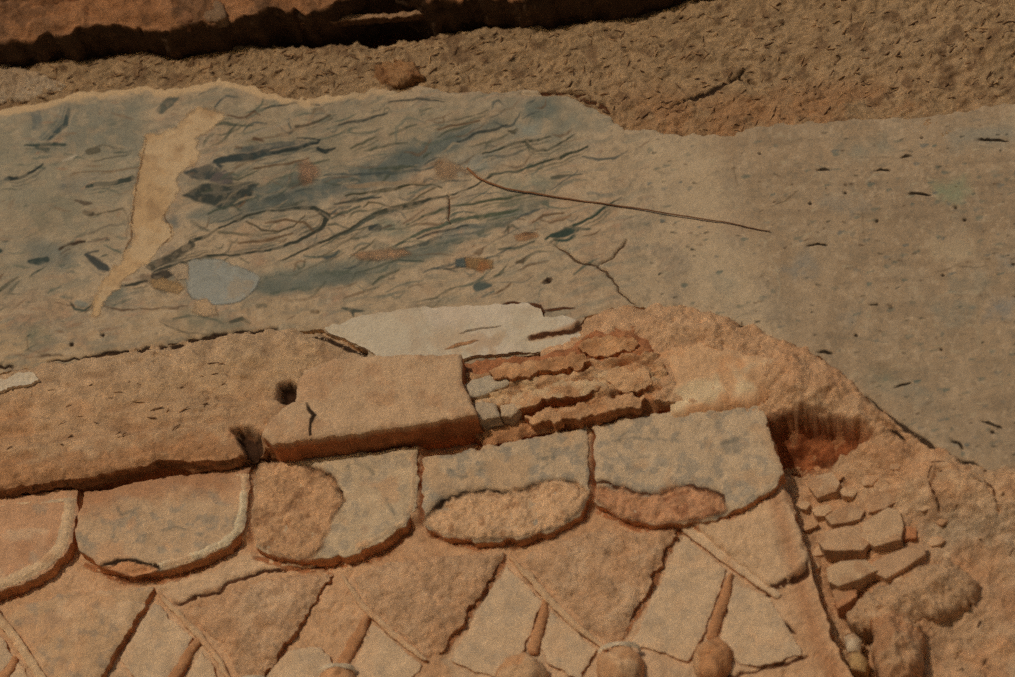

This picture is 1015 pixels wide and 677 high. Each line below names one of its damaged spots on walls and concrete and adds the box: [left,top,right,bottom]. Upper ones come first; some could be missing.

crack [540,92,611,114]
crack [677,73,753,105]
peeling [92,107,224,316]
peeling [151,259,260,316]
crack [557,242,634,305]
spalling [464,326,667,448]
spalling [769,422,857,478]